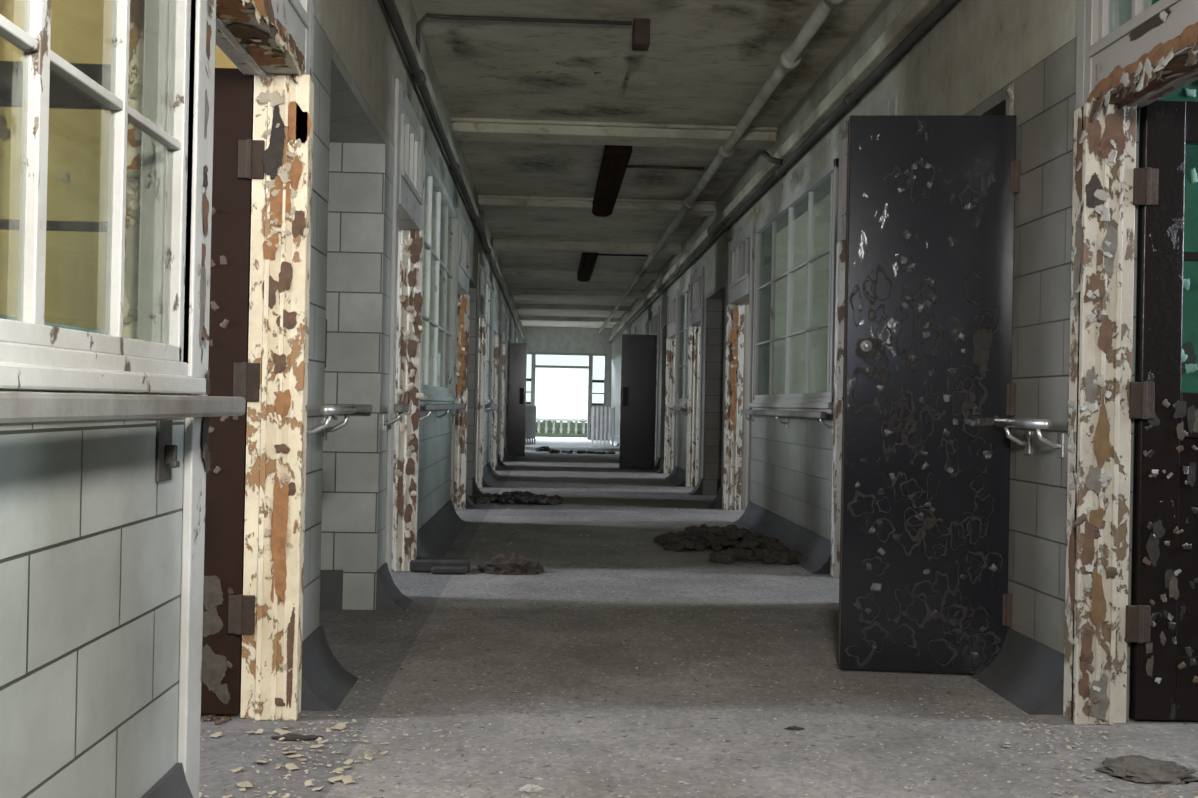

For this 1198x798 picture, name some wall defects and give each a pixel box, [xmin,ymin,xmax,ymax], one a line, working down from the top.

peeling [204,0,305,139]
spalling [1129,8,1171,41]
peeling [198,165,229,347]
peeling [257,89,312,374]
peeling [1070,22,1198,353]
peeling [275,389,291,416]
peeling [394,237,424,547]
peeling [1143,399,1198,488]
peeling [201,575,234,705]
peeling [270,575,295,708]
peeling [1066,366,1118,720]
peeling [1142,519,1198,684]